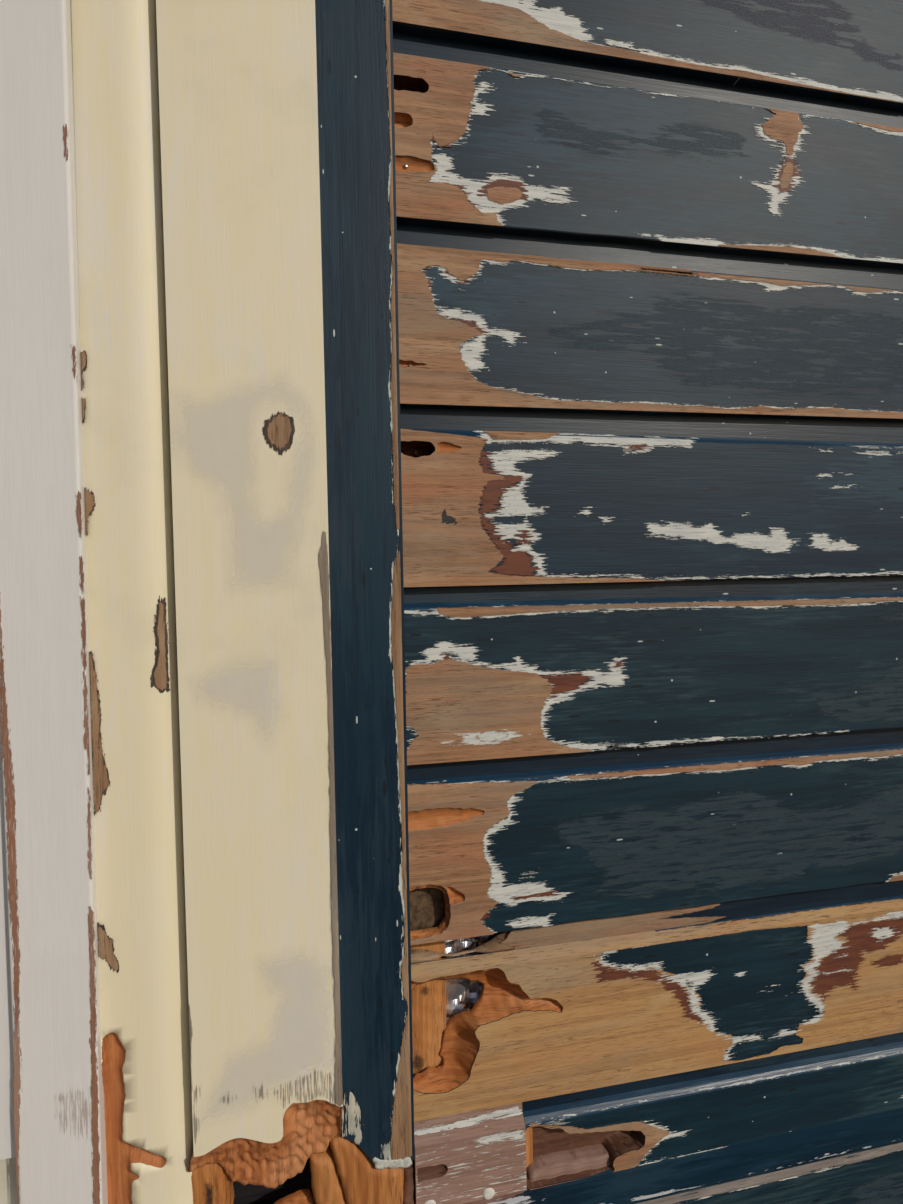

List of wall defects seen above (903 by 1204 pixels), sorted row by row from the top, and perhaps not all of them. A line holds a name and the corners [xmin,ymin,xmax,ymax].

peeling [381,0,903,1172]
peeling [150,596,170,693]
spalling [88,906,167,1204]
spalling [233,1157,313,1204]
peeling [464,1176,593,1204]
peeling [630,1186,712,1201]
peeling [731,1150,849,1192]